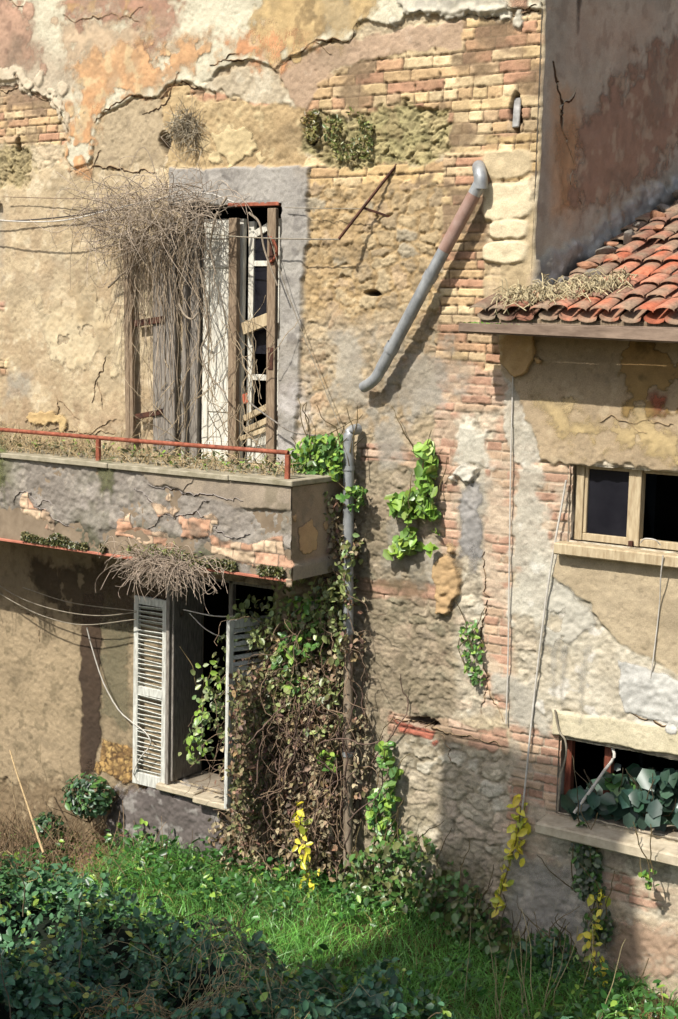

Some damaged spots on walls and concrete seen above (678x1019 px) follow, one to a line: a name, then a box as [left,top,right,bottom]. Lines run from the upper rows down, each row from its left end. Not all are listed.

peeling [225,0,376,74]
crack [276,23,357,67]
flaking render [388,0,530,30]
peeling [0,0,211,179]
crack [94,72,200,124]
crack [72,150,155,174]
crack [25,357,115,435]
peeling [534,396,678,465]
crack [134,480,250,539]
flaking render [115,494,294,586]
water stain [30,557,186,774]
flaking render [618,660,678,734]